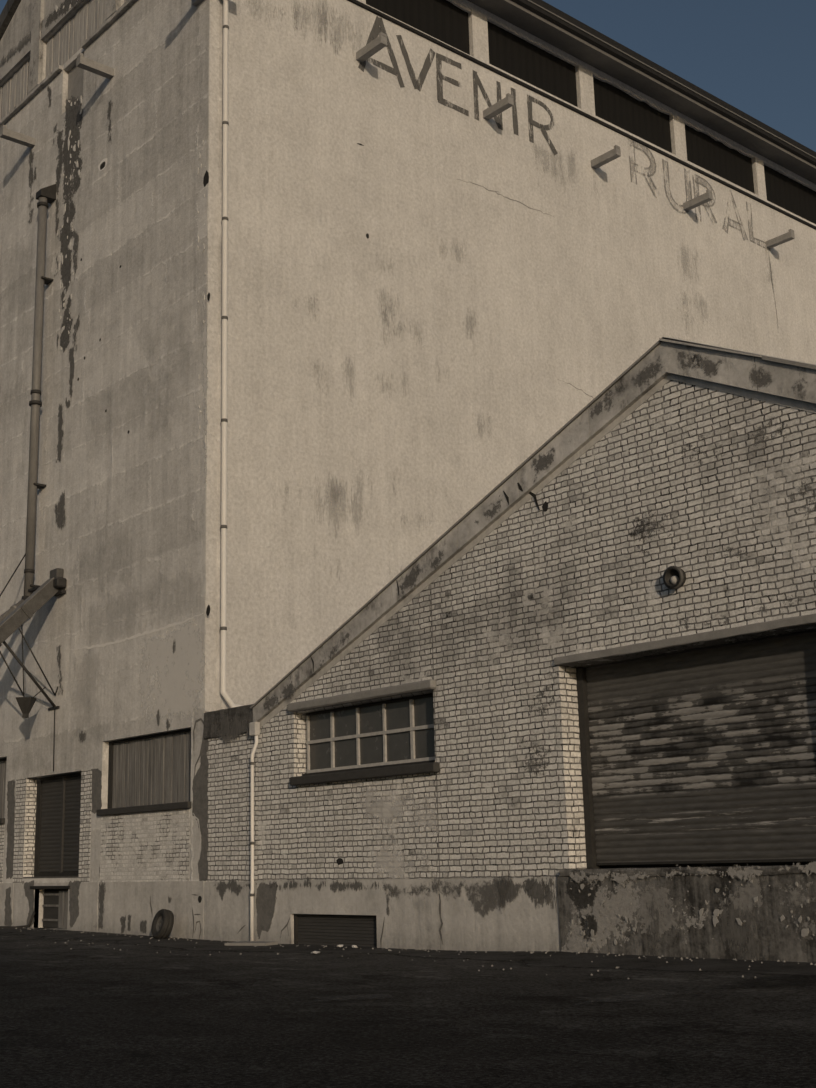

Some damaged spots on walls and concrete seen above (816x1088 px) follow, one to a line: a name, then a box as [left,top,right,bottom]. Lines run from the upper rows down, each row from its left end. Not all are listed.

flaking render [0,0,81,67]
flaking render [54,96,83,463]
flaking render [55,491,66,529]
damp [269,875,556,917]
peeling [561,861,816,953]